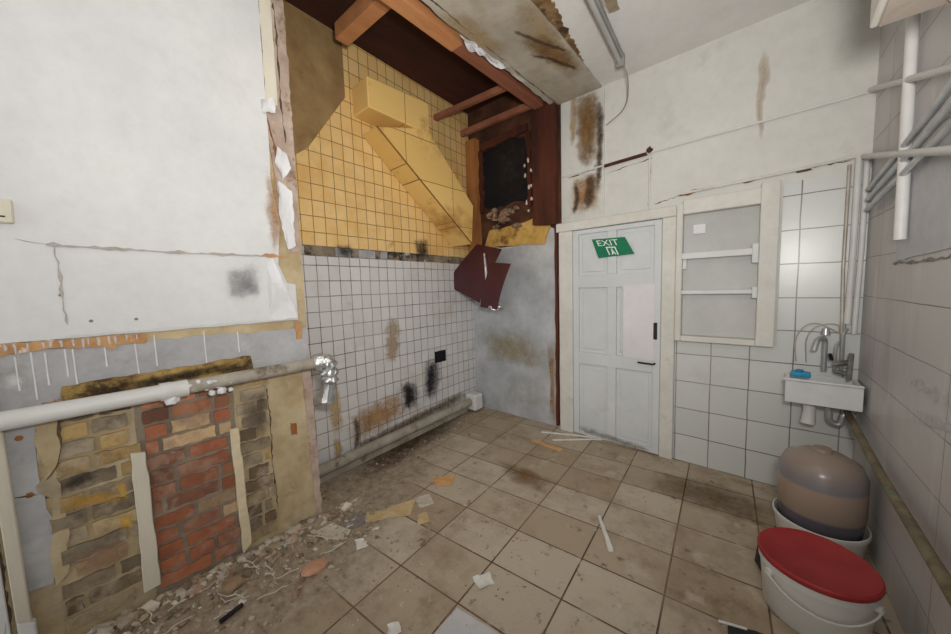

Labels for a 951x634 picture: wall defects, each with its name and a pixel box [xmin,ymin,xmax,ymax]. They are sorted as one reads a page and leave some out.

peeling [459,34,525,82]
spalling [531,0,584,62]
spalling [605,0,620,13]
spalling [258,0,464,264]
spalling [486,158,533,230]
peeling [266,258,302,339]
peeling [0,334,147,357]
damp [387,321,398,358]
damp [403,365,438,407]
flaking render [14,378,278,634]